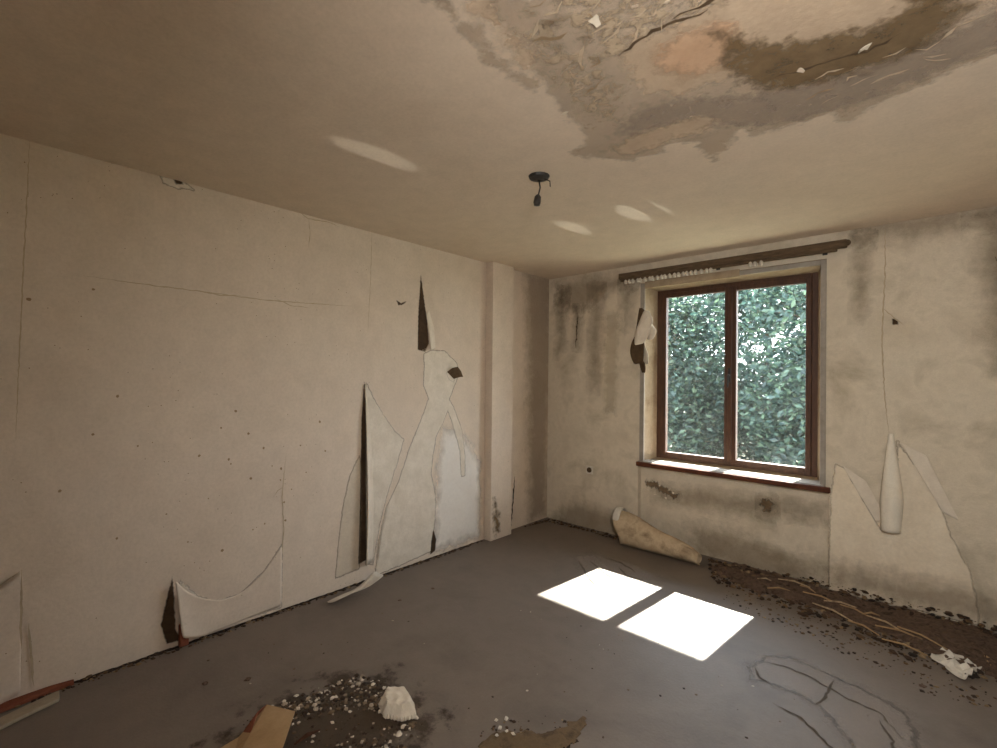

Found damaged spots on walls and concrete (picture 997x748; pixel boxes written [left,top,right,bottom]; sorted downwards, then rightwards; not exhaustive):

water stain [508,0,985,121]
water stain [616,117,712,154]
peeling [630,308,657,373]
peeling [375,350,465,574]
peeling [829,434,979,625]